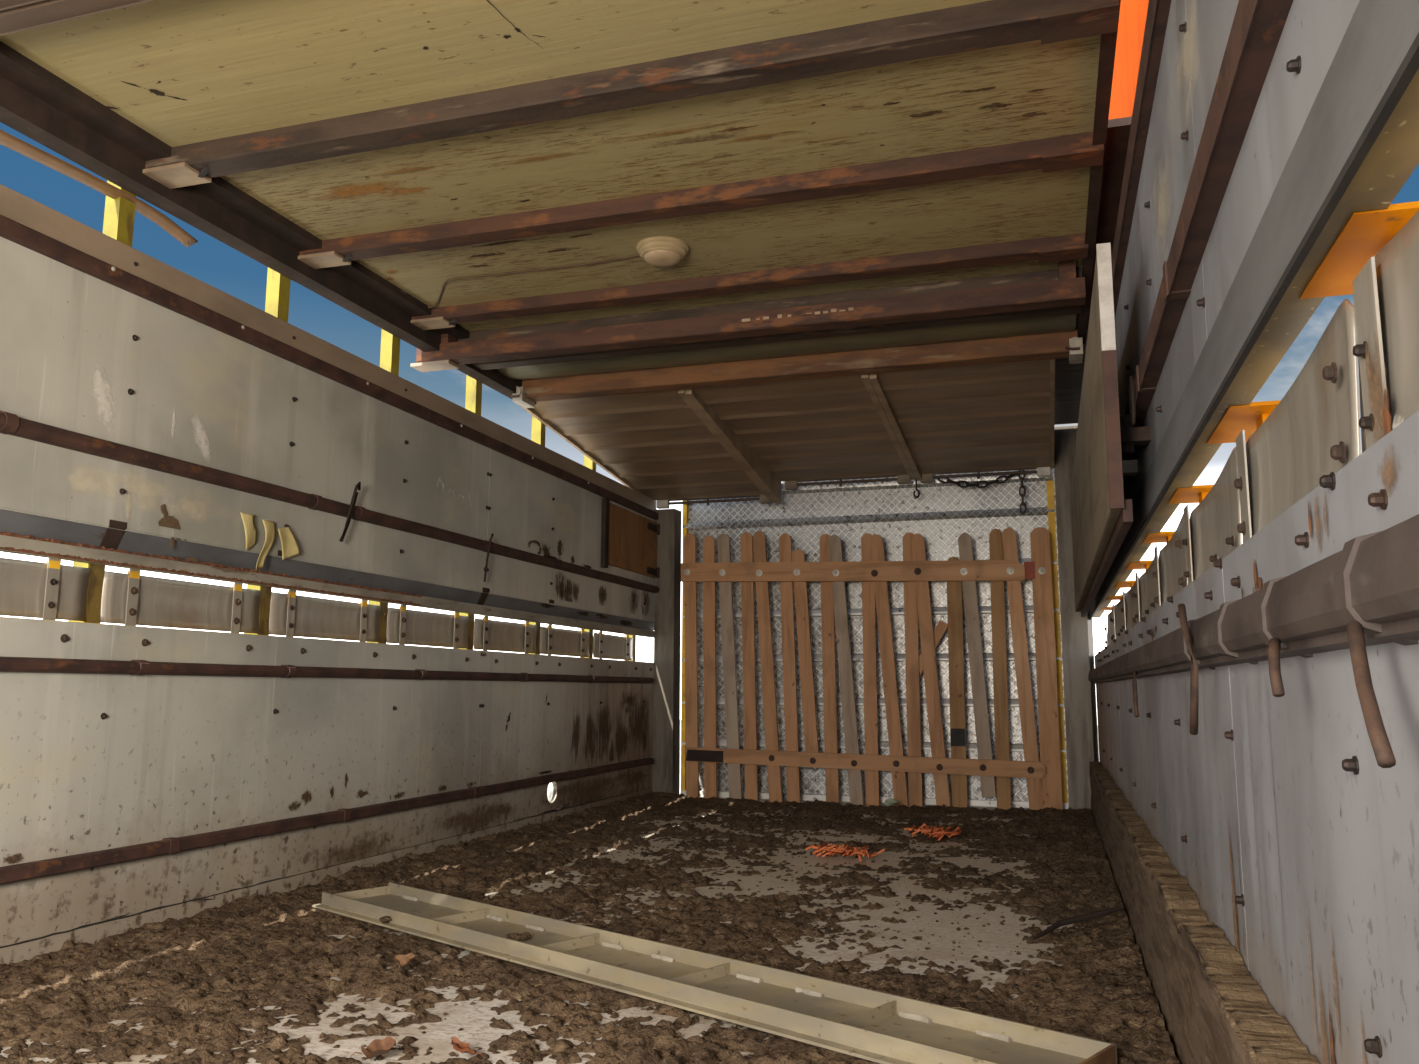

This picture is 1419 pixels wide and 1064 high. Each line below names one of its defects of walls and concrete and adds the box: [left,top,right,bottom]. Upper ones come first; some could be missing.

corrosion [647,125,775,144]
corrosion [334,166,434,197]
leakage [549,692,649,805]
leakage [446,803,510,833]
leakage [4,853,23,864]